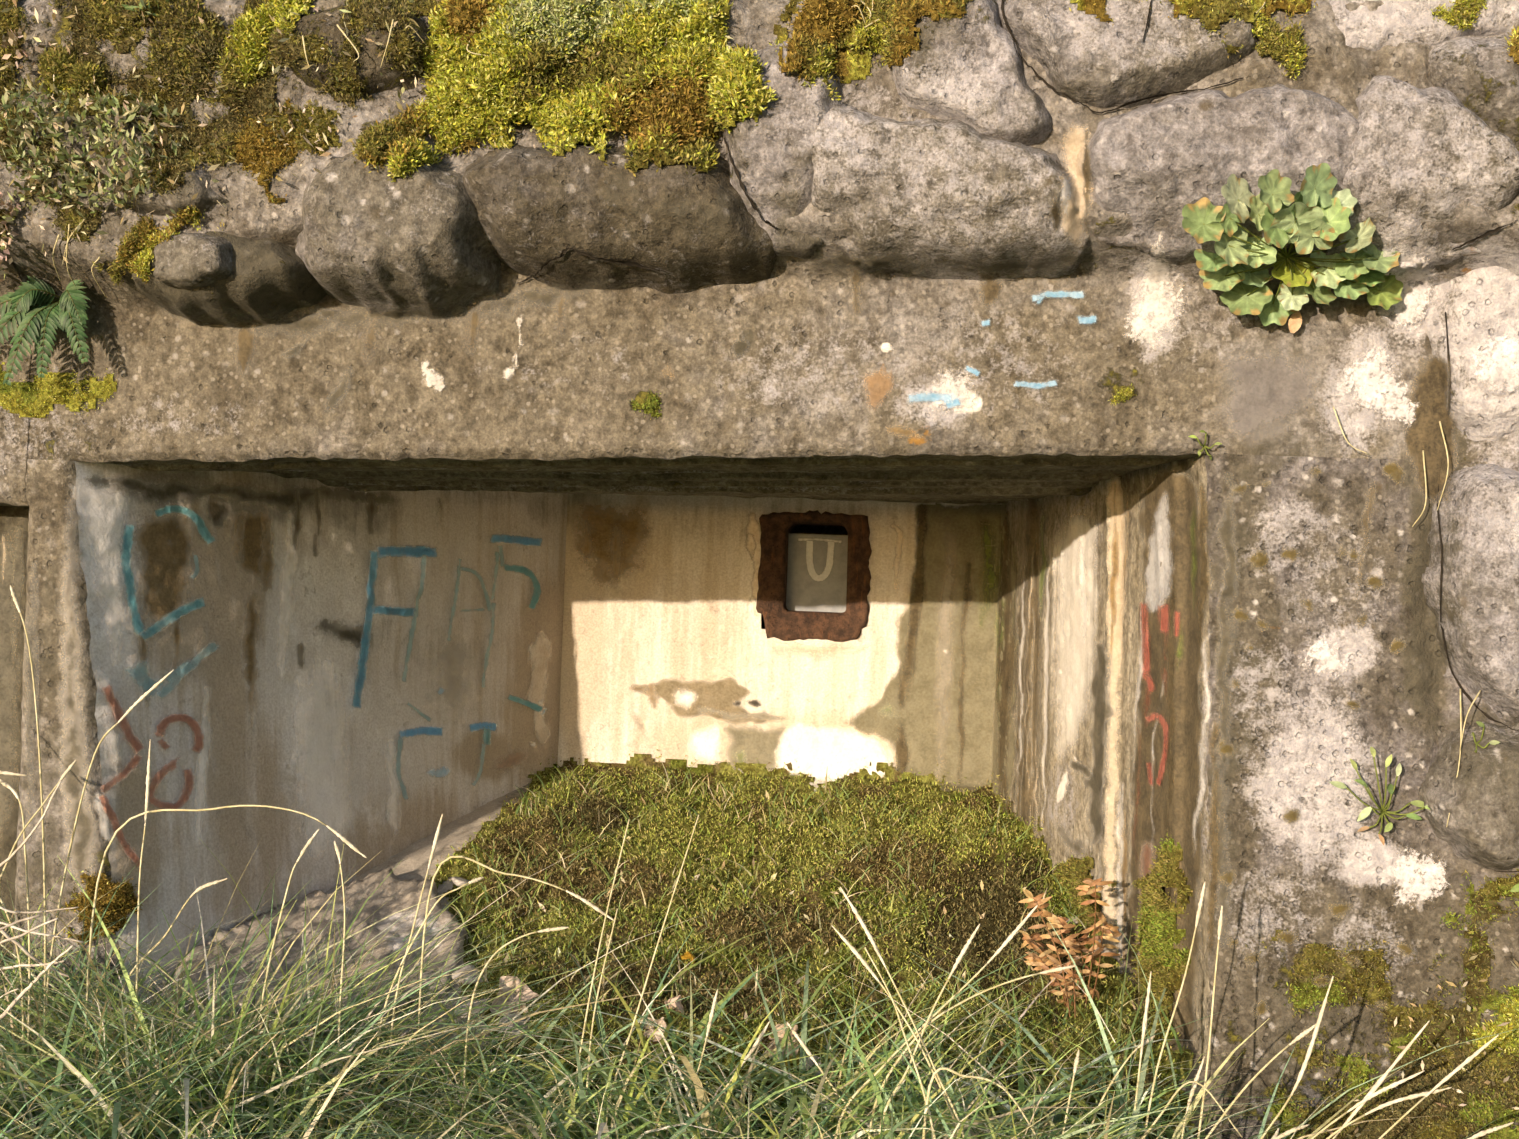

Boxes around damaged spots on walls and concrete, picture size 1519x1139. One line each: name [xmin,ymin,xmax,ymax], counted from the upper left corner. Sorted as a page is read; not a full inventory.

leakage [87,476,394,726]
leakage [298,672,347,848]
leakage [577,505,647,583]
spalling [631,502,1019,809]
leakage [1012,469,1219,1056]